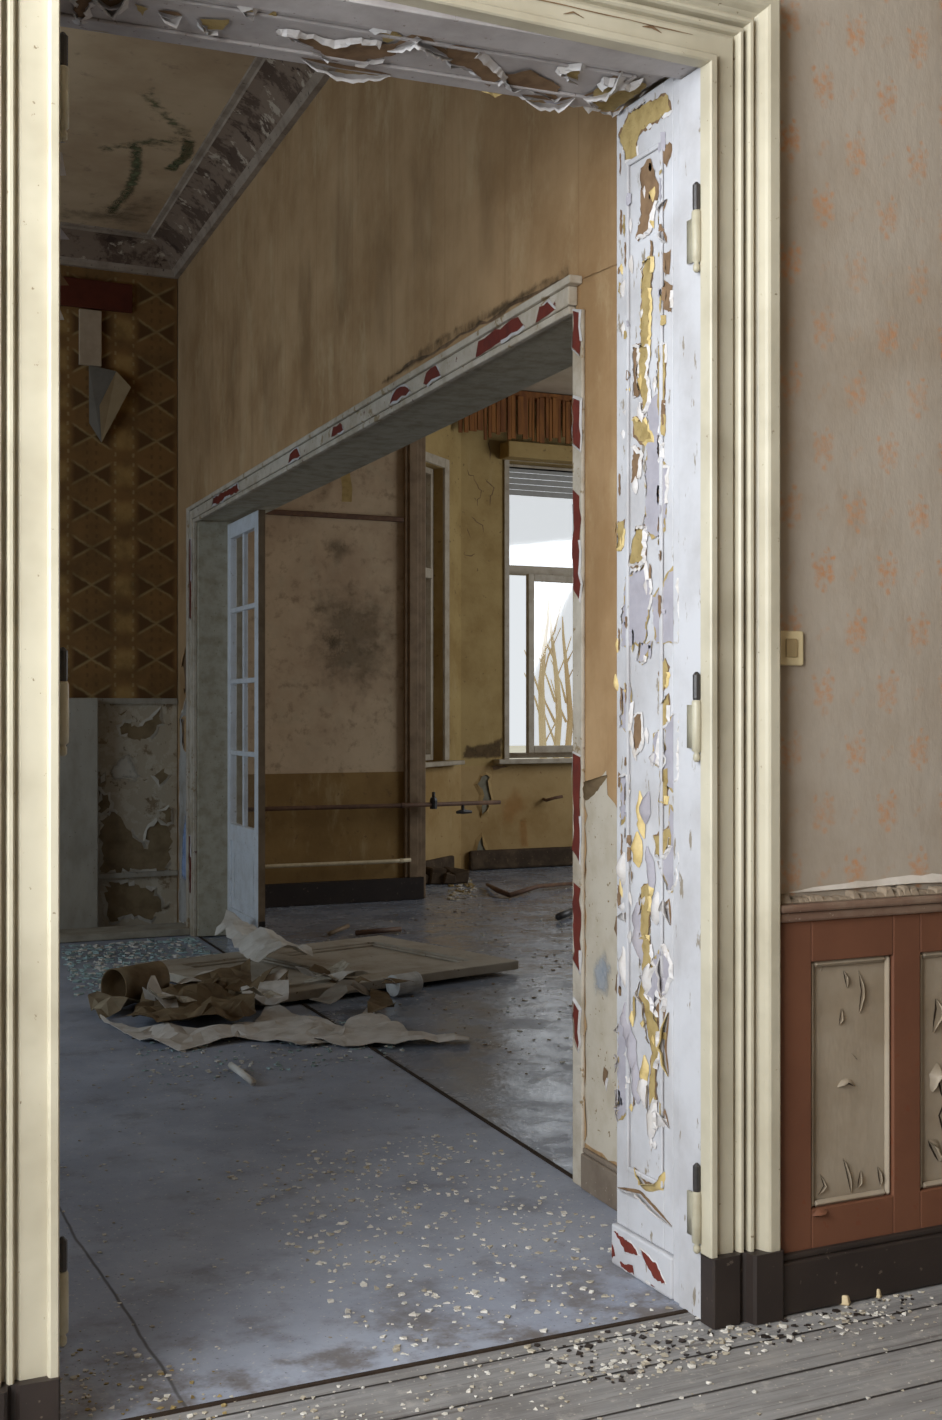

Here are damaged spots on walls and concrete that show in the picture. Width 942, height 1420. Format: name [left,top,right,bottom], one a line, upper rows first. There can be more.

flaking render [69,0,693,1162]